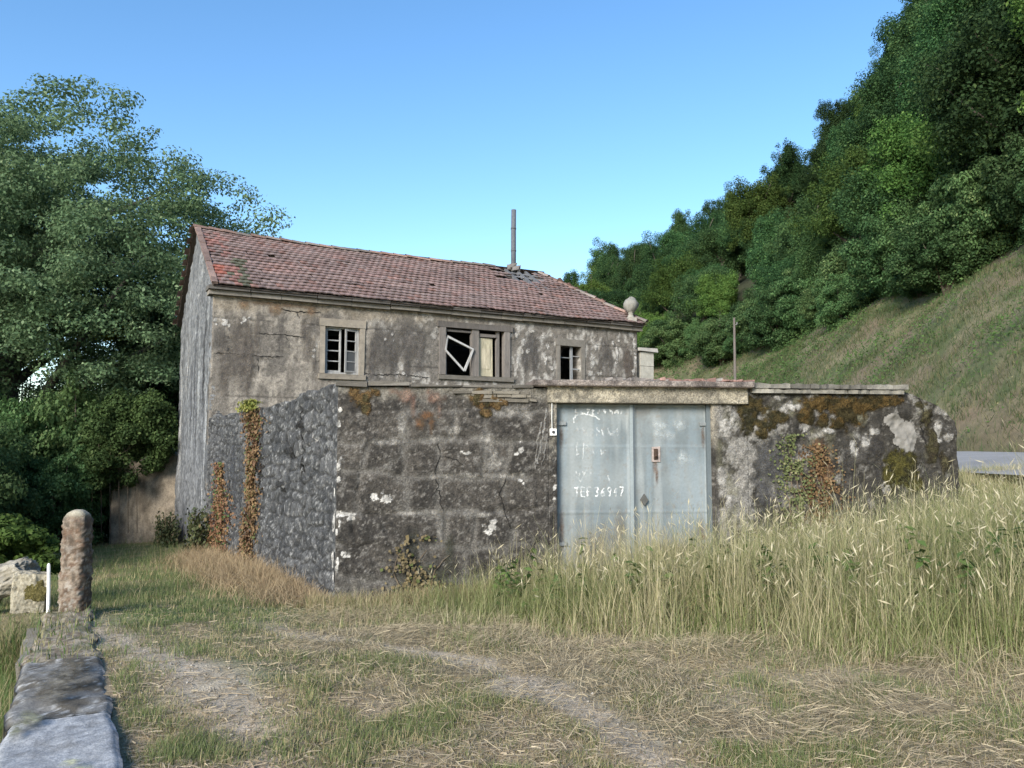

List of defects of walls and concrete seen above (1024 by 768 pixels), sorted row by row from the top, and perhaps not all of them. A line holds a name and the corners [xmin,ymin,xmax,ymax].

crack [429,444,463,509]
peeling [370,492,392,504]
peeling [482,519,497,535]